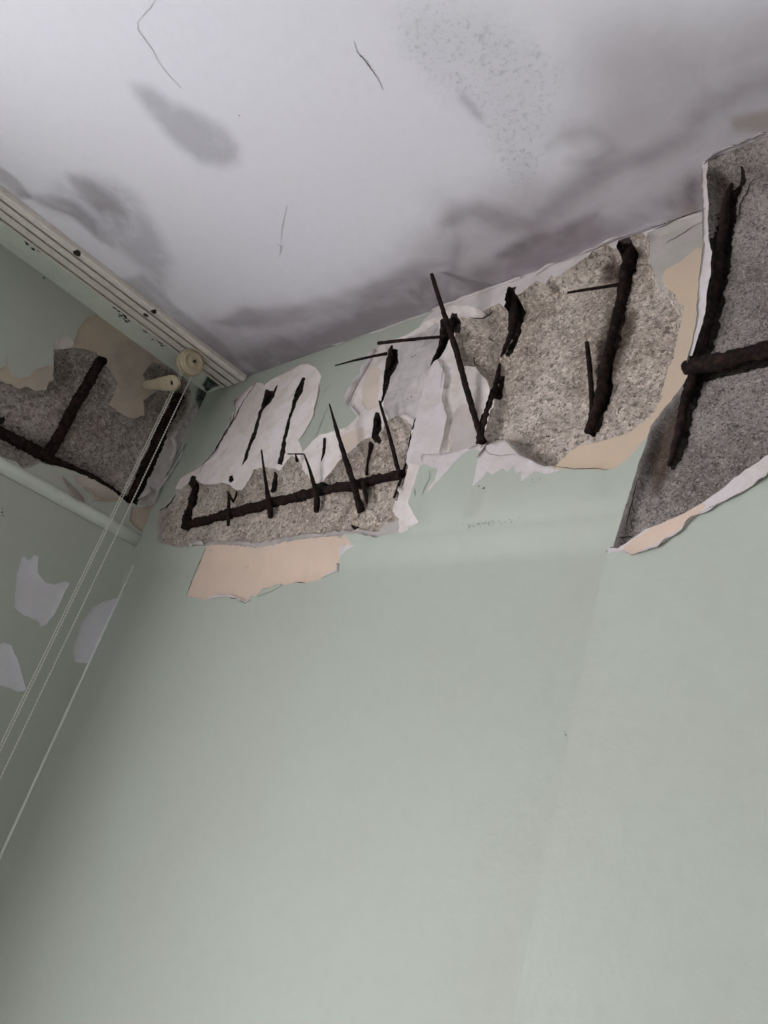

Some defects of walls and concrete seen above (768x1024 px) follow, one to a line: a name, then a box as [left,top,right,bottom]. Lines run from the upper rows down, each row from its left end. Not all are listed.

spalling [0,132,768,603]
rust [597,307,634,372]
peeling [14,555,70,627]